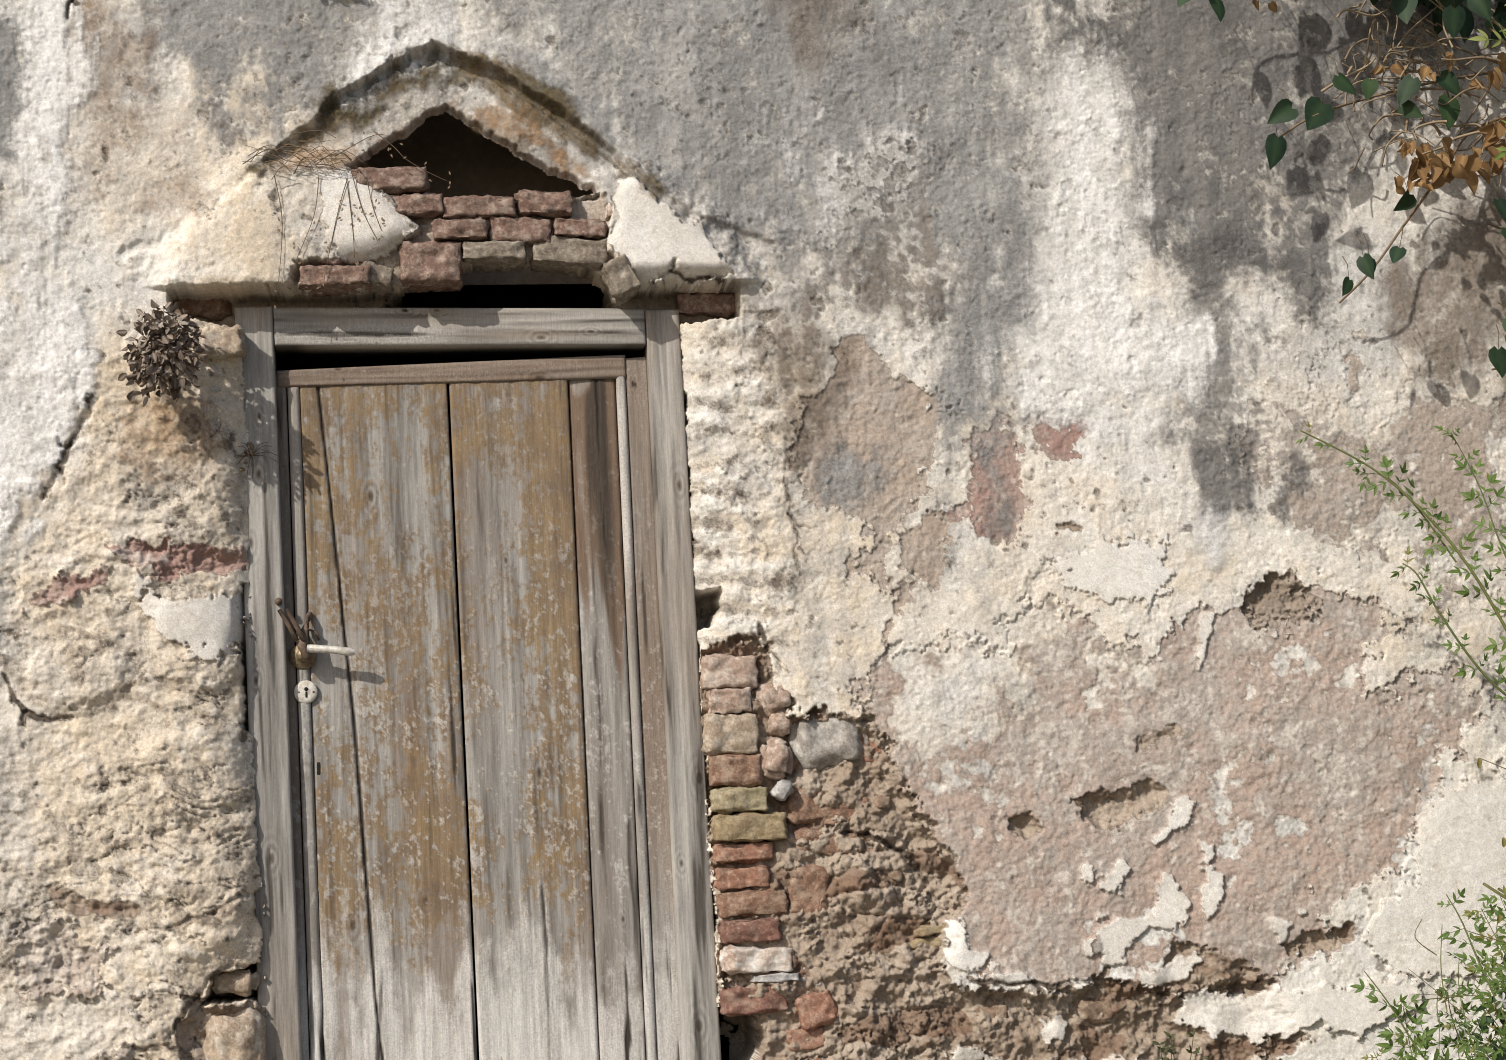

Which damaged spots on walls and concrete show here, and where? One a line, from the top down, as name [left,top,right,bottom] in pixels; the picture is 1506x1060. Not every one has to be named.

damp [0,0,99,552]
damp [140,0,459,145]
peeling [296,167,415,280]
damp [491,0,1506,569]
crack [2,673,73,727]
spalling [699,329,1506,1060]